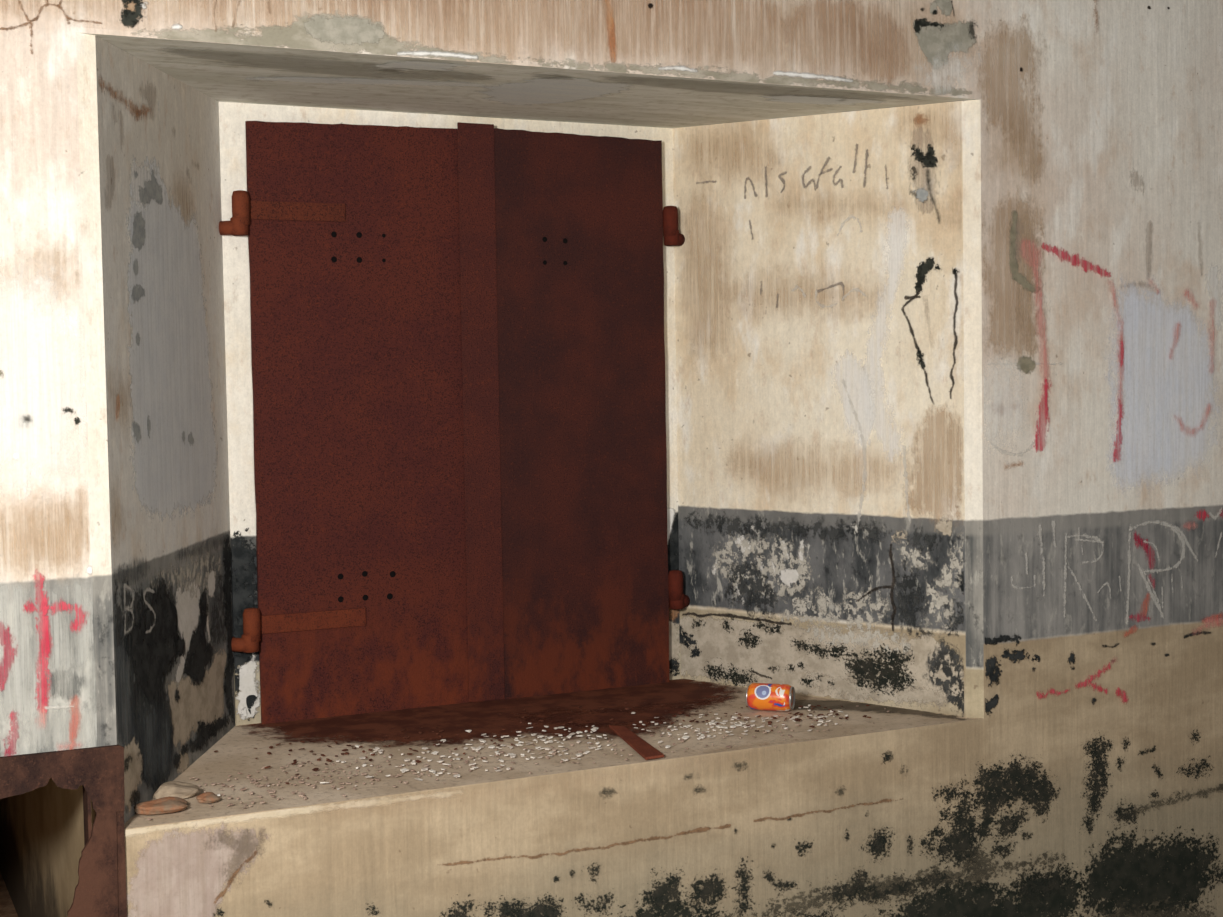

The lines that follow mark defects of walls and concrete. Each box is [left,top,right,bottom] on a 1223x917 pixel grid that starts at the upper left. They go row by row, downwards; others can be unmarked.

crack [0,0,101,54]
spalling [121,0,977,106]
crack [902,257,958,402]
corrosion [243,679,742,747]
leakage [679,612,965,720]
leakage [439,729,1223,917]